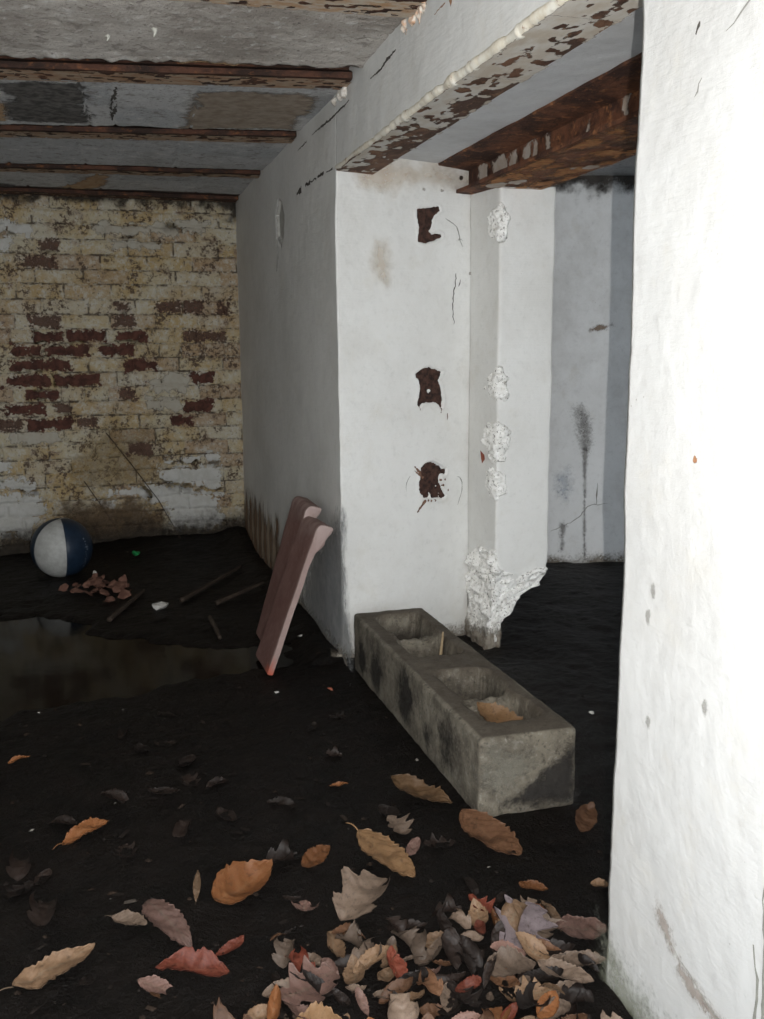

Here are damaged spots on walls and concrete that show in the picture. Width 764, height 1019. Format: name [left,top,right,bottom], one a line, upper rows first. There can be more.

leakage [0,81,96,124]
corrosion [483,126,638,190]
flaking render [0,217,61,272]
peeling [91,219,211,252]
flaking render [154,298,234,317]
flaking render [181,328,229,345]
flaking render [0,300,215,445]
peeling [0,457,48,539]
peeling [92,441,227,528]
leakage [547,411,624,563]
crack [753,890,764,1019]